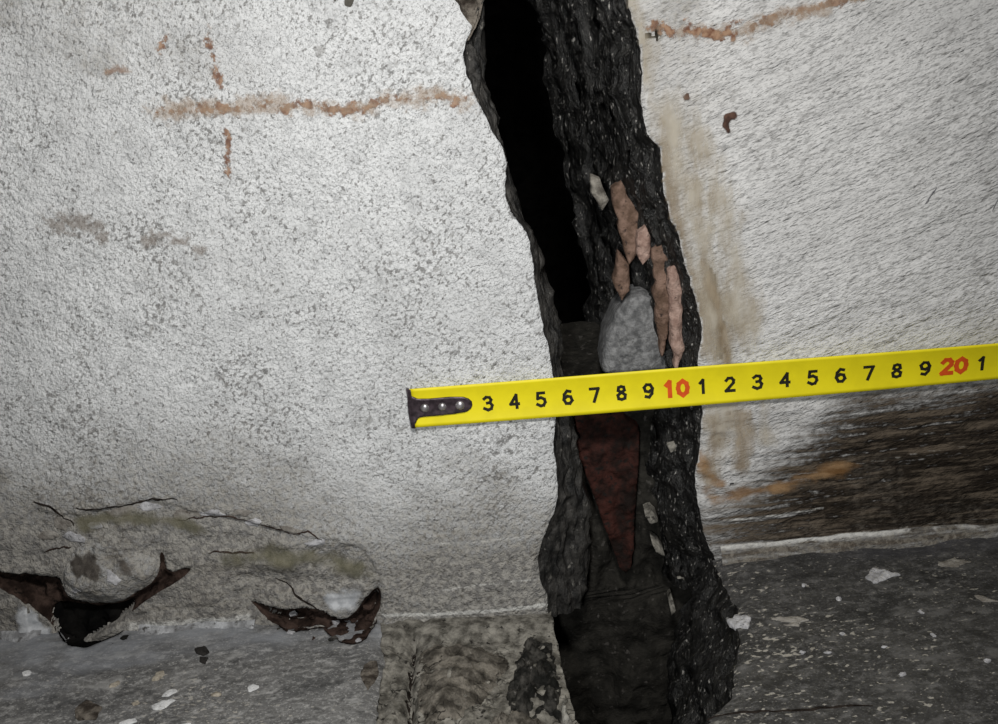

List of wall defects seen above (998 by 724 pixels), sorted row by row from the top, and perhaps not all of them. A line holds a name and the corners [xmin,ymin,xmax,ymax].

corrosion [204,38,223,89]
corrosion [222,128,232,177]
corrosion [253,94,411,117]
crack [463,0,702,378]
water stain [659,107,685,245]
corrosion [646,0,848,41]
water stain [690,259,757,364]
water stain [710,403,751,469]
spalling [0,552,190,648]
crack [538,405,873,724]
crack [405,647,420,724]
spalling [251,577,579,724]